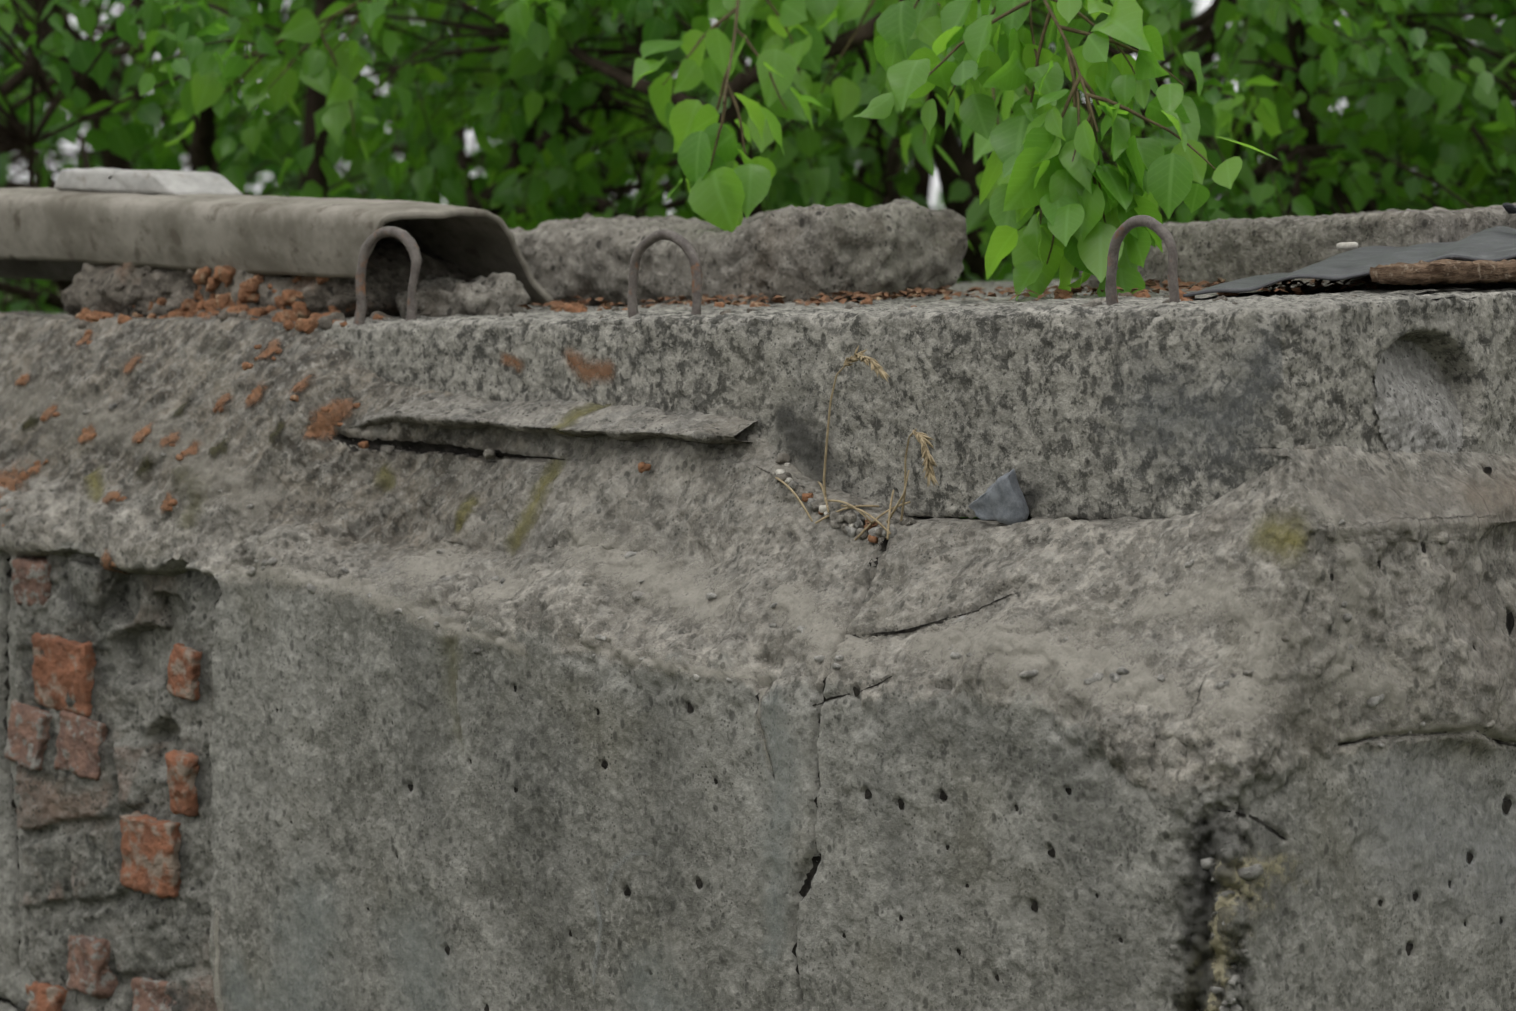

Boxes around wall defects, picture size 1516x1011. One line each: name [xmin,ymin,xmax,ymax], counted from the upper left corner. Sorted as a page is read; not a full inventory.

crack [869,538,888,588]
crack [846,592,1018,639]
flaking render [167,643,209,701]
flaking render [4,632,110,781]
crack [1338,728,1516,747]
crack [799,676,892,901]
flaking render [118,749,209,899]
flaking render [16,935,187,1011]
crack [792,943,800,975]
crack [0,997,18,1008]